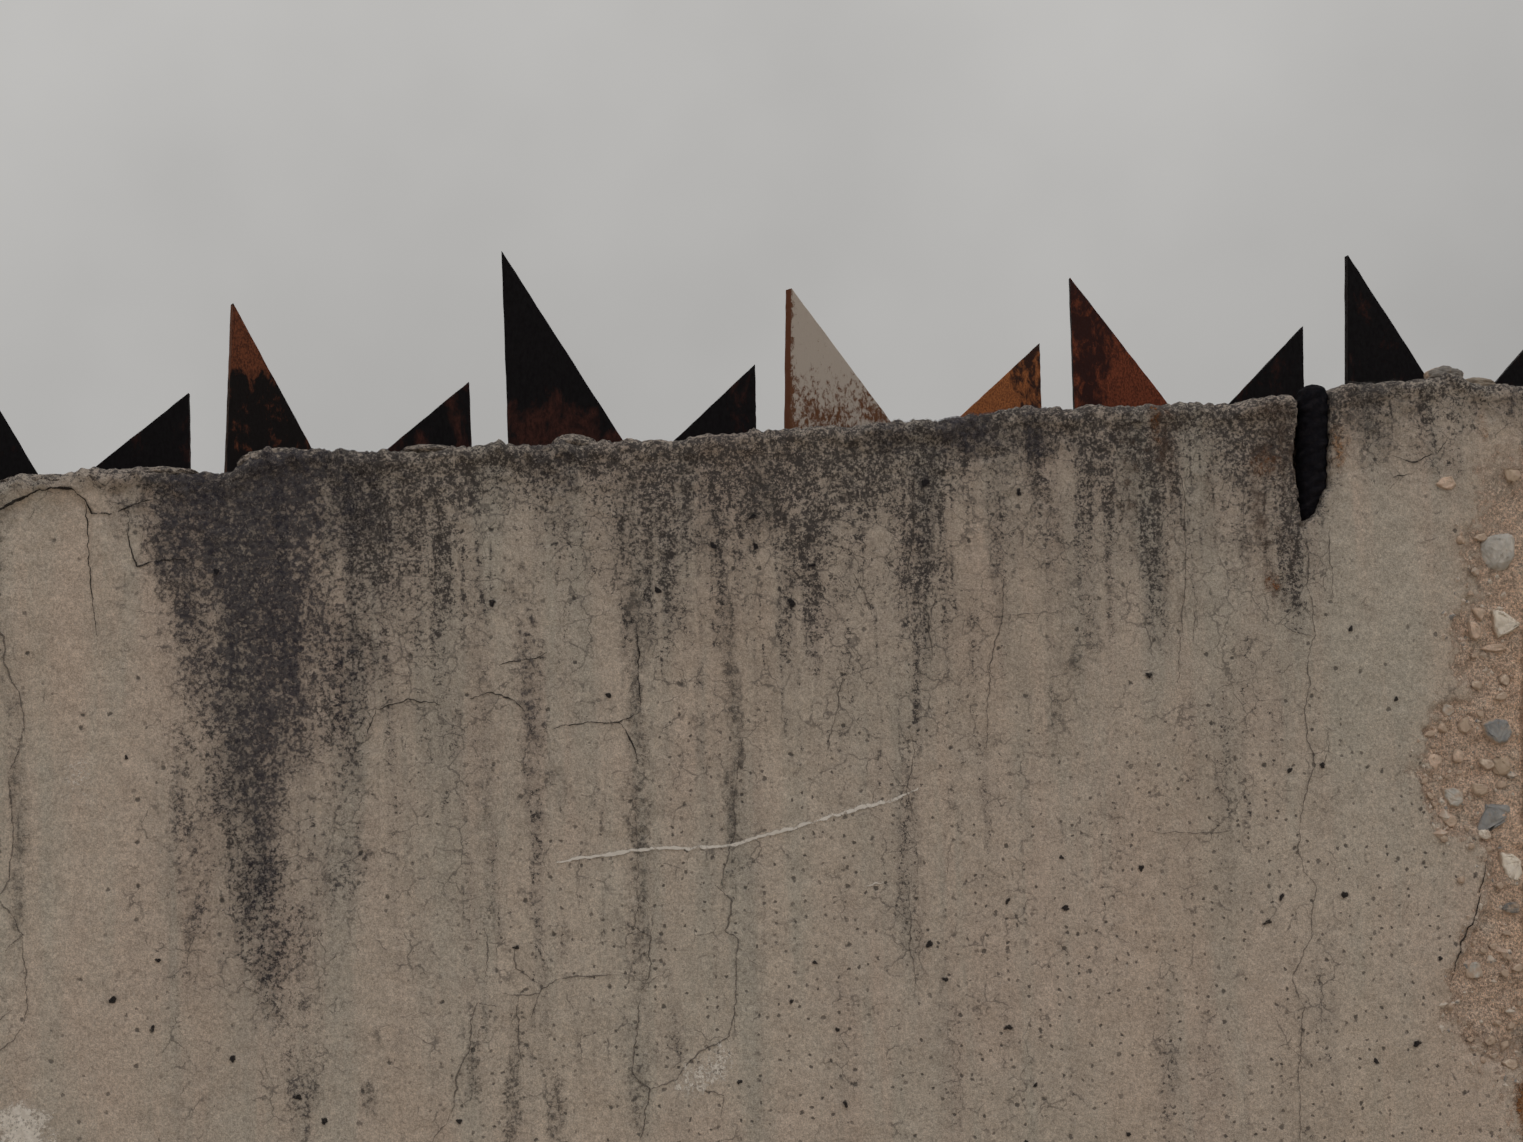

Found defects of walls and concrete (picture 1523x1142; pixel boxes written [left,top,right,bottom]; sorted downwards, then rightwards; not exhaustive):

crack [0,632,28,1050]
crack [0,486,191,635]
leakage [117,446,395,1016]
leakage [516,594,548,774]
leakage [619,463,650,954]
crack [432,734,918,1142]
leakage [720,598,744,886]
crack [907,466,937,662]
leakage [873,405,1063,555]
leakage [1249,403,1294,597]
spalling [1405,447,1523,1137]
leakage [286,1050,319,1133]